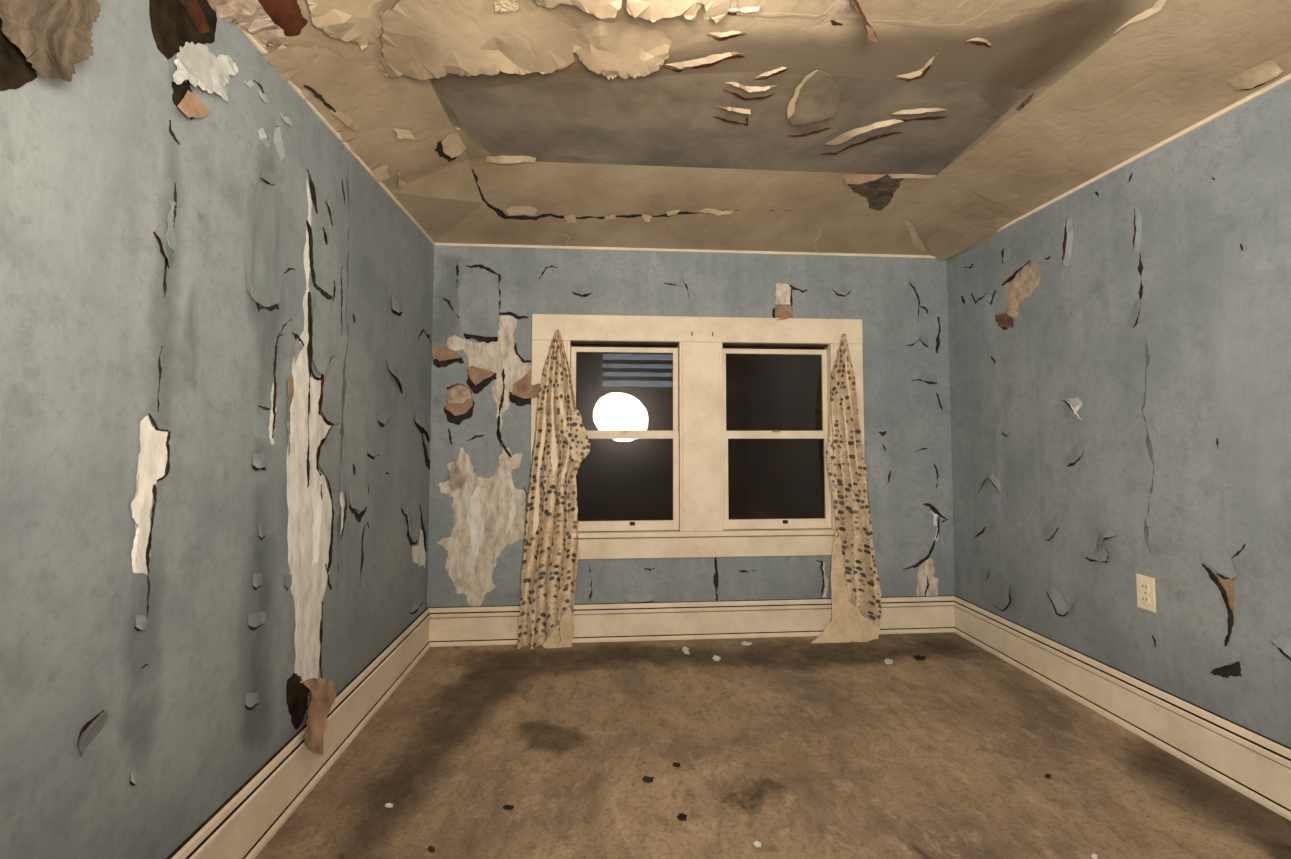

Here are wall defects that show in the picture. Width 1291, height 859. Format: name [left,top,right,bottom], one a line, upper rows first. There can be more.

peeling [0,0,101,91]
peeling [149,0,293,185]
peeling [486,155,536,164]
crack [471,168,739,246]
peeling [663,6,818,73]
peeling [713,67,788,126]
peeling [820,108,947,155]
peeling [995,218,1074,330]
flaking render [284,169,380,755]
flaking render [401,264,540,606]
flaking render [130,413,171,632]
peeling [1194,520,1245,678]